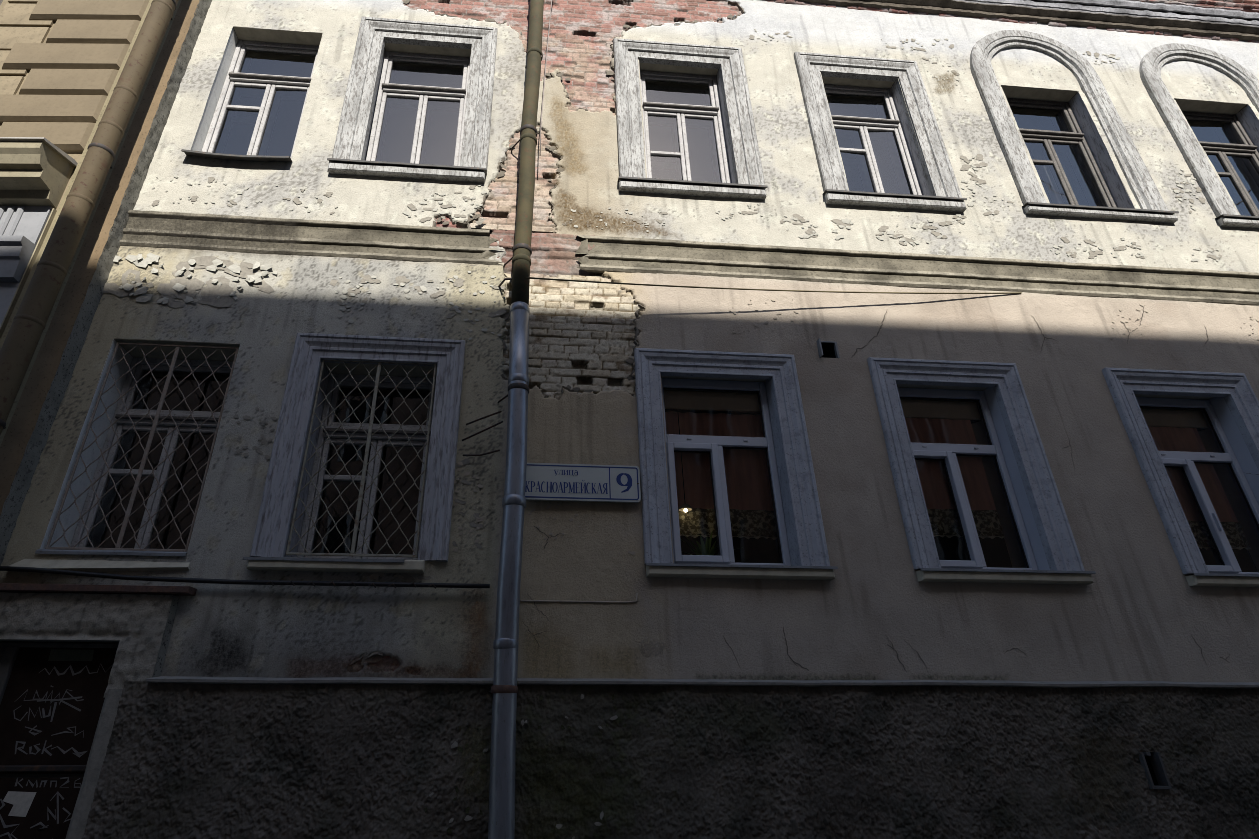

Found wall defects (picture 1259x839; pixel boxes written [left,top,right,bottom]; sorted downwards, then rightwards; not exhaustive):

peeling [1083,51,1121,65]
flaking render [402,130,521,230]
flaking render [532,125,668,233]
peeling [1051,237,1144,259]
peeling [1191,247,1222,262]
peeling [330,271,512,380]
flaking render [528,273,643,400]